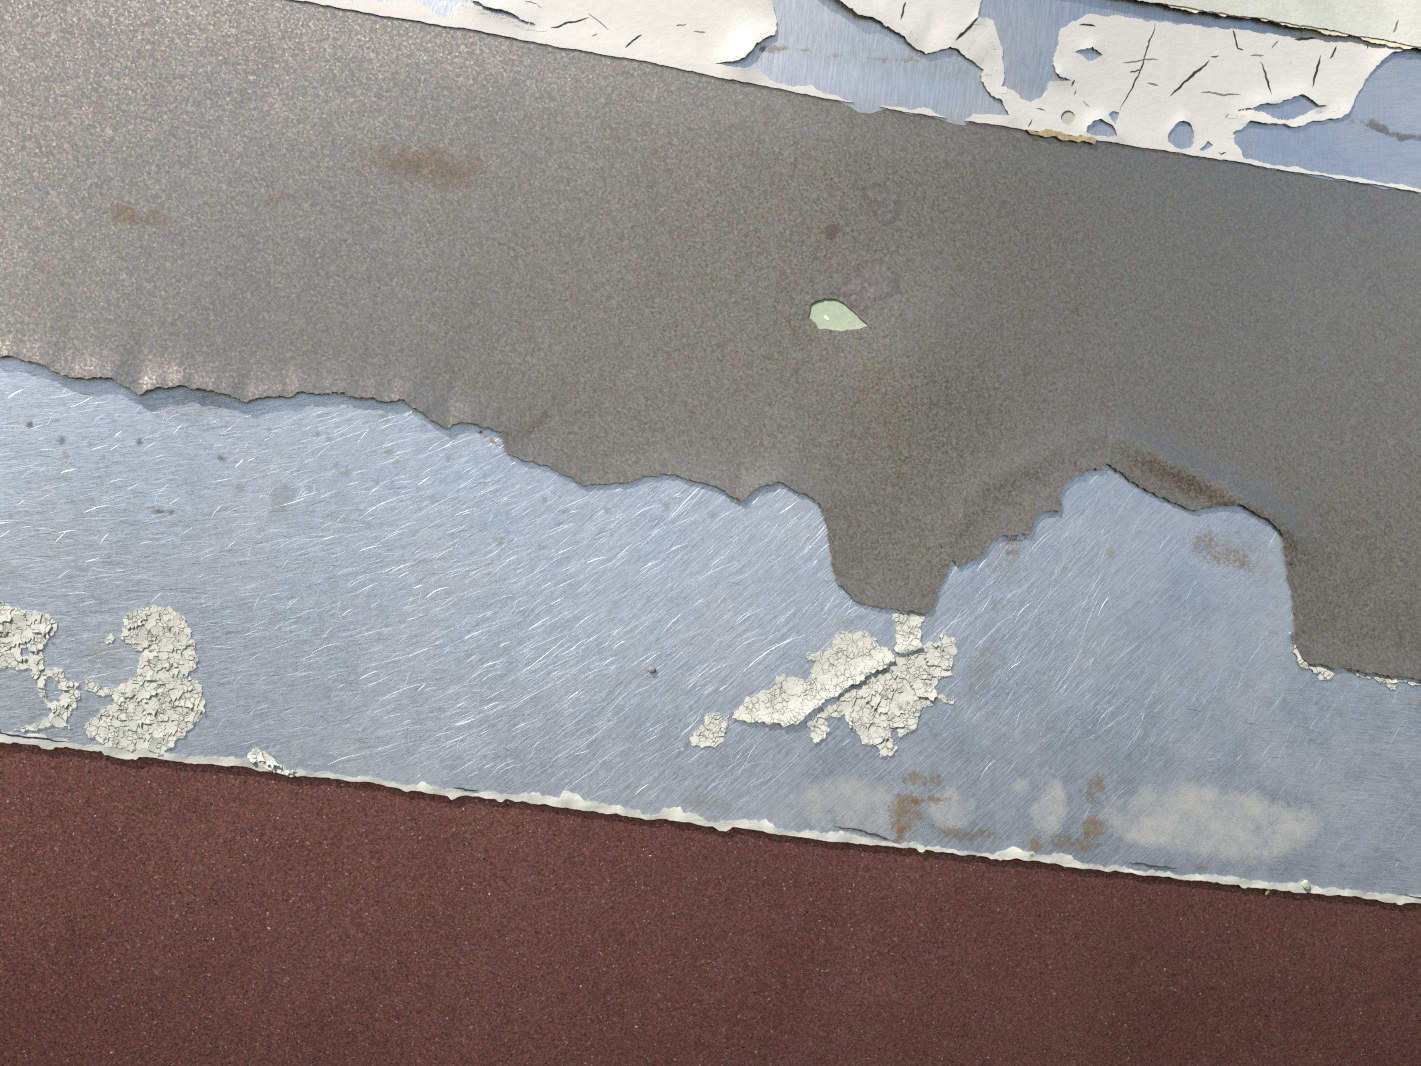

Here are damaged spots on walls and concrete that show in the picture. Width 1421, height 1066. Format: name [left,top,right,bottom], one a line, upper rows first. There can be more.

peeling [414,0,547,31]
peeling [716,0,1302,126]
peeling [1061,110,1119,141]
crack [1028,28,1368,126]
peeling [1168,44,1421,195]
peeling [0,332,1421,897]